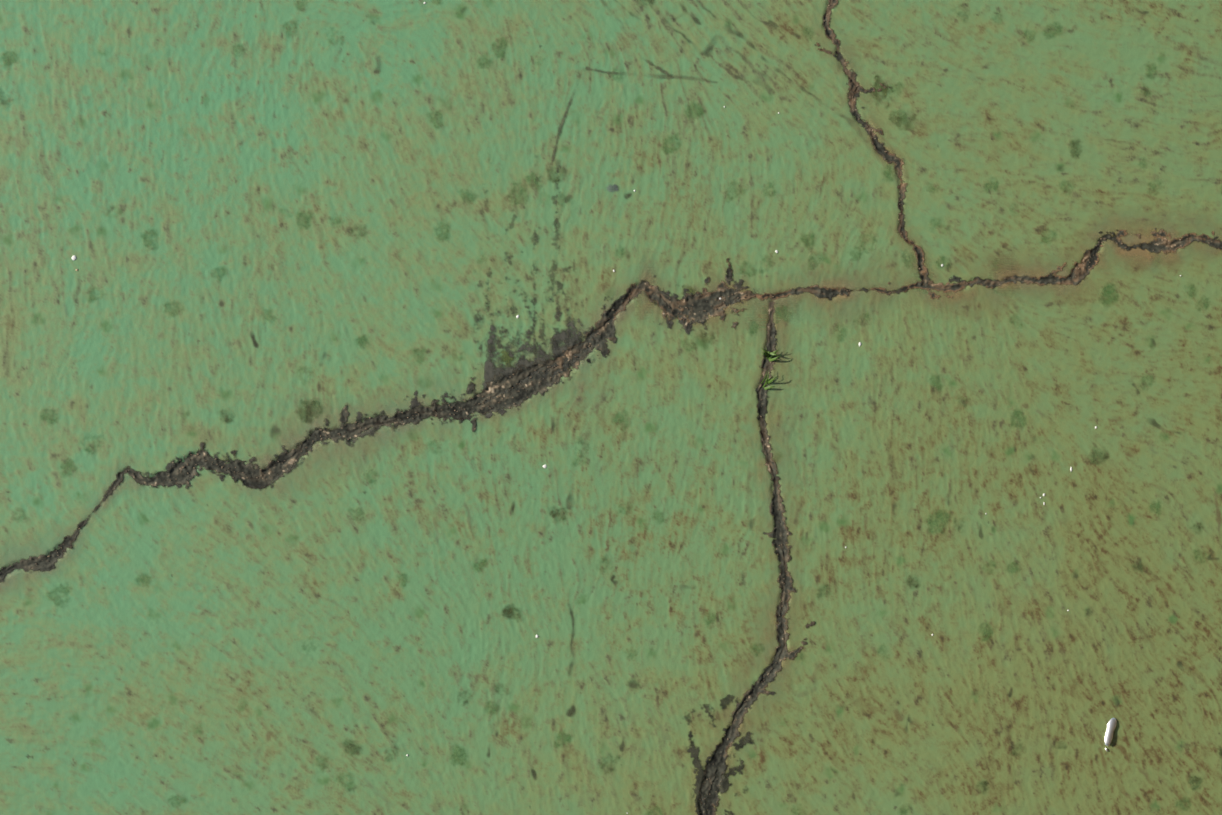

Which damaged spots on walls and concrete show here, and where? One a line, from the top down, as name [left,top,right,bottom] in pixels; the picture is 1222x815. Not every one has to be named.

crack [552,102,570,161]
crack [814,0,1222,299]
crack [0,258,853,815]